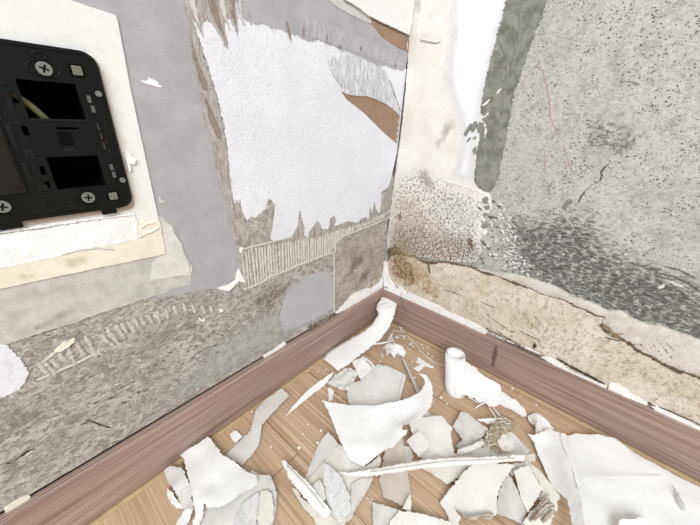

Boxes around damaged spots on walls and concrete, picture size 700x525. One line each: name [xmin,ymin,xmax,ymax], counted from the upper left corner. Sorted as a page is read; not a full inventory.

peeling [192,3,406,241]
crack [578,164,609,203]
damp [393,172,479,263]
peeling [218,268,245,291]
spalling [279,231,384,331]
peeling [476,200,700,377]
damp [499,207,700,339]
peeling [0,344,29,398]
peeling [54,337,76,353]
peeling [413,357,434,372]
peeling [4,494,31,513]